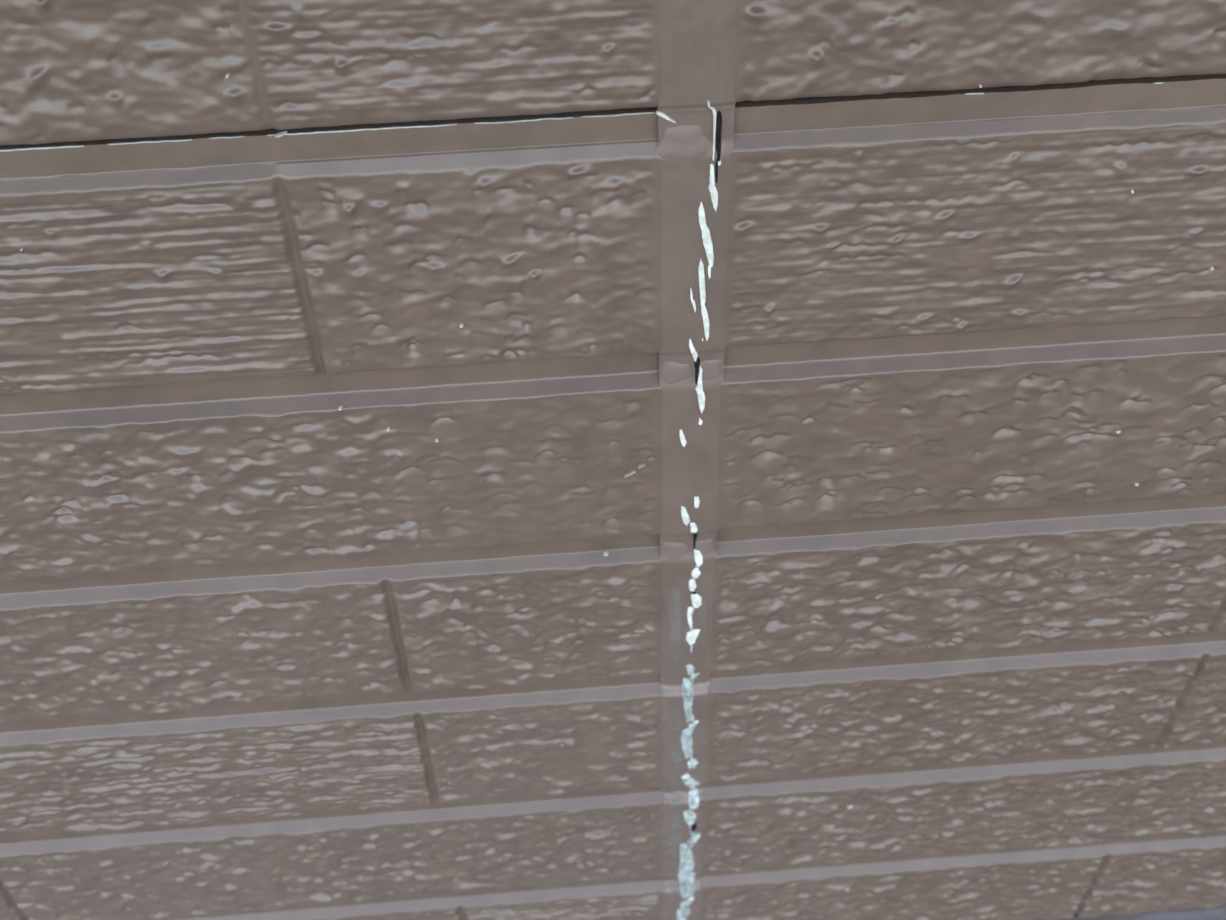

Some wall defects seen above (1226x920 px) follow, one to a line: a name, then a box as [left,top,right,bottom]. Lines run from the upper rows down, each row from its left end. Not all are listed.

crack [0,108,654,151]
crack [679,96,839,447]
crack [677,496,703,920]